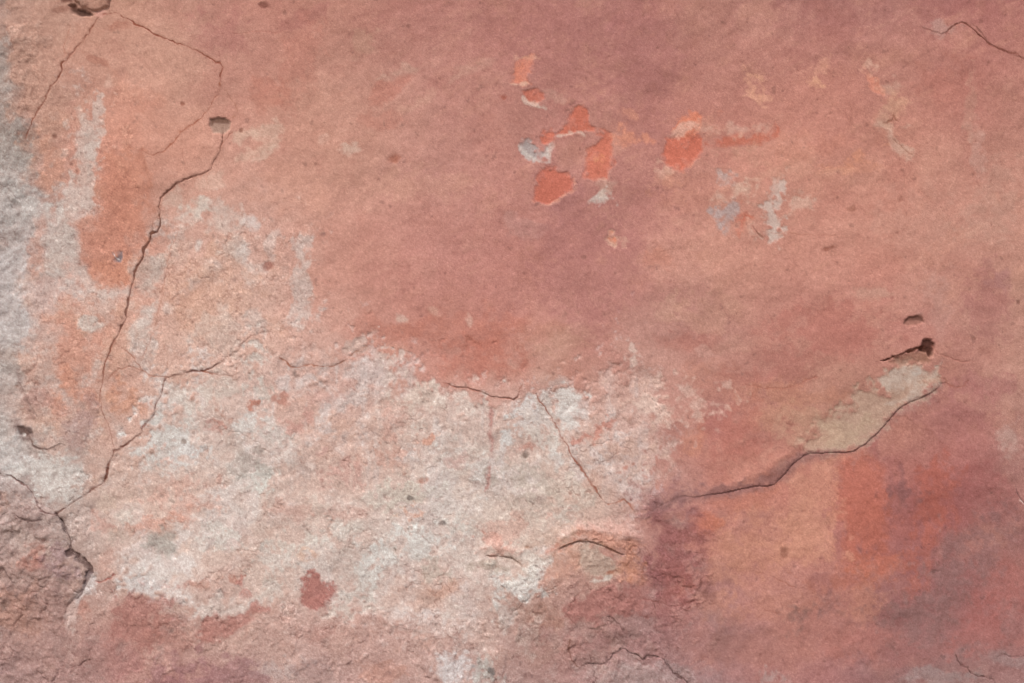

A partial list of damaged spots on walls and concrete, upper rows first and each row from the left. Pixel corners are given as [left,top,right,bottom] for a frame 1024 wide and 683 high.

peeling [498,52,548,111]
crack [887,20,1024,60]
peeling [516,62,819,251]
damp [0,87,120,414]
crack [0,10,369,607]
spalling [769,314,947,461]
damp [0,419,95,517]
crack [442,338,976,558]
damp [57,522,181,637]
damp [137,633,277,683]
damp [170,578,287,626]
damp [423,642,510,683]